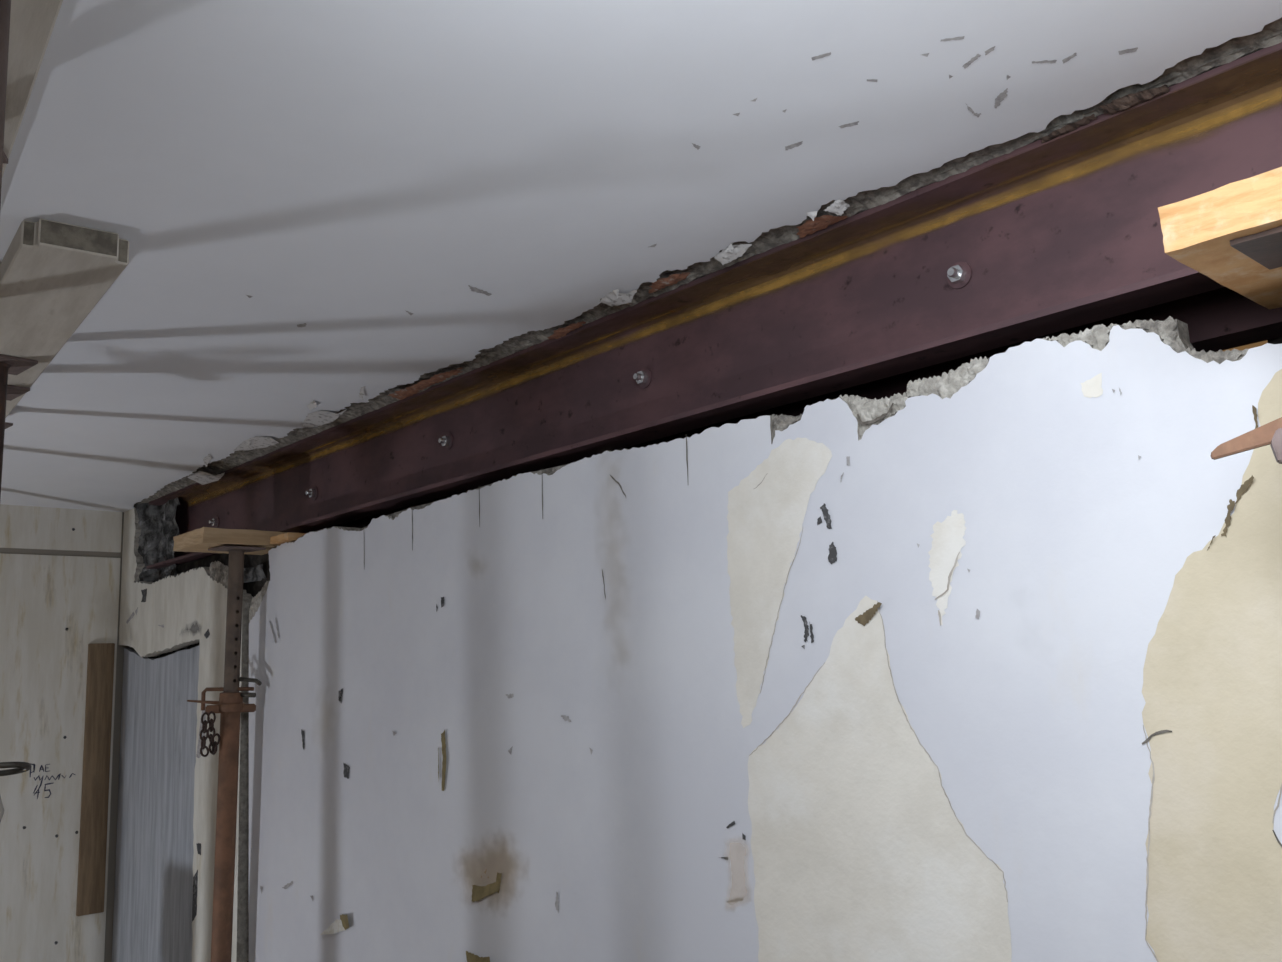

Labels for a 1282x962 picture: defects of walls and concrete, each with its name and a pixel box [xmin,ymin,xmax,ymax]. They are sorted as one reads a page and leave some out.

spalling [126,18,1282,625]
peeling [438,730,446,791]
peeling [466,951,490,962]
peeling [726,414,850,728]
peeling [726,596,1012,962]
peeling [1142,444,1282,962]